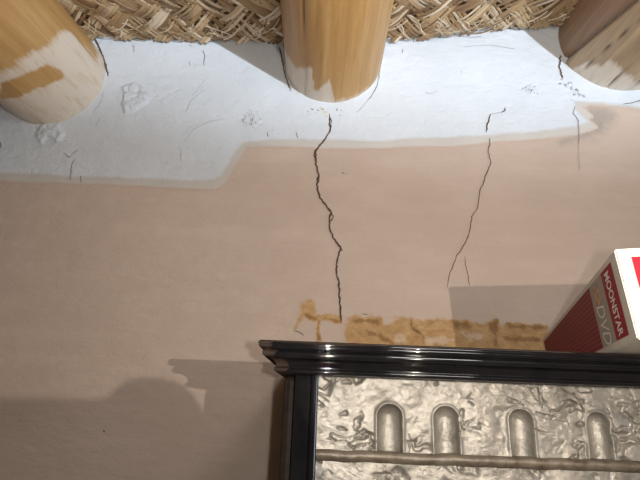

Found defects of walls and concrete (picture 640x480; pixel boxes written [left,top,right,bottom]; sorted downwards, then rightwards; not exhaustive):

crack [314,114,343,321]
crack [446,107,506,289]
flaking render [342,312,551,350]